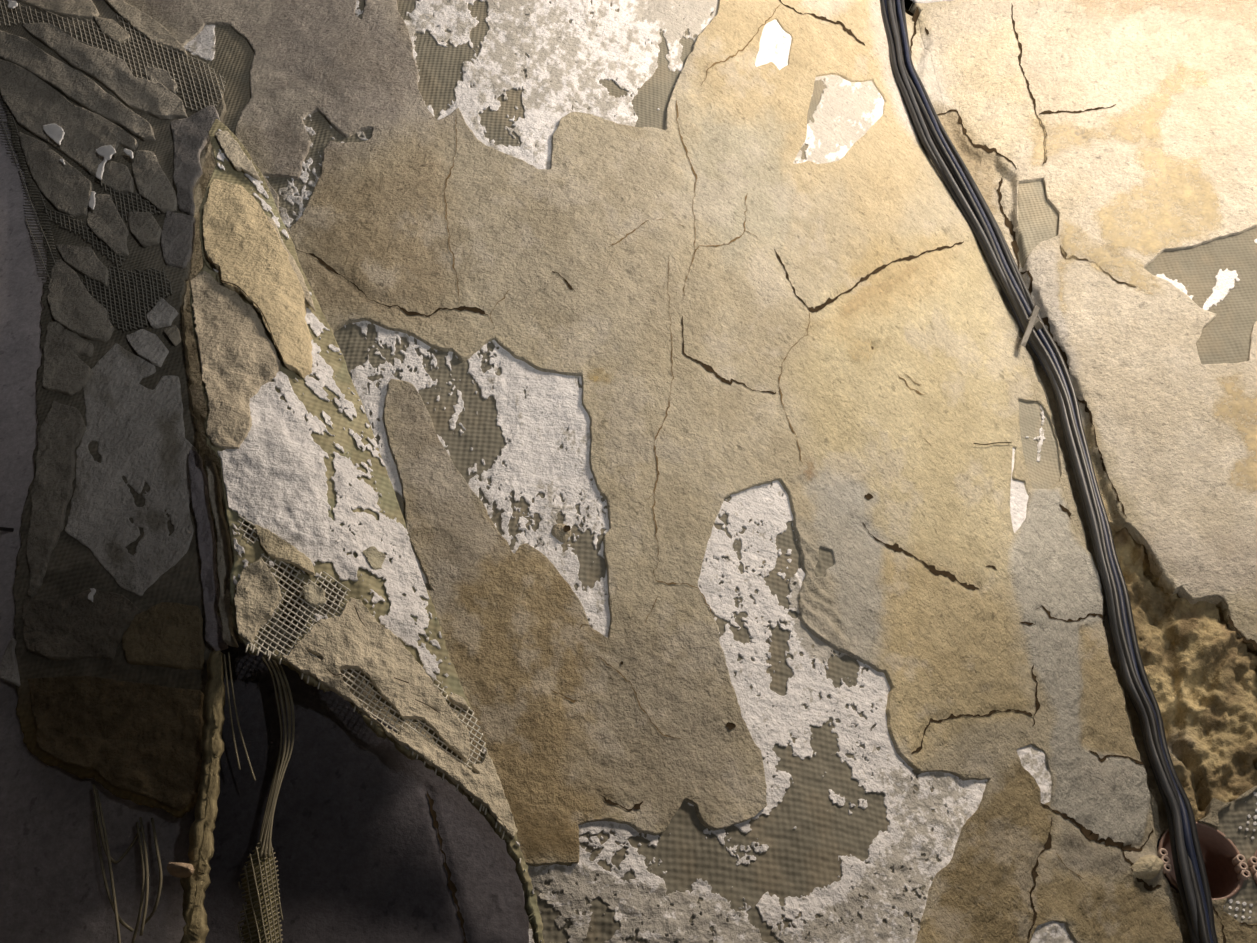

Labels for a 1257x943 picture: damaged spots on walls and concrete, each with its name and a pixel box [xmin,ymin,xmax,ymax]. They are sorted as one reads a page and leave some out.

crack [295,117,509,328]
crack [609,0,964,623]
crack [937,3,1136,516]
peeling [1144,227,1257,365]
flaking render [0,0,988,943]
crack [863,523,997,590]
crack [911,665,1040,754]
crack [1020,605,1105,626]